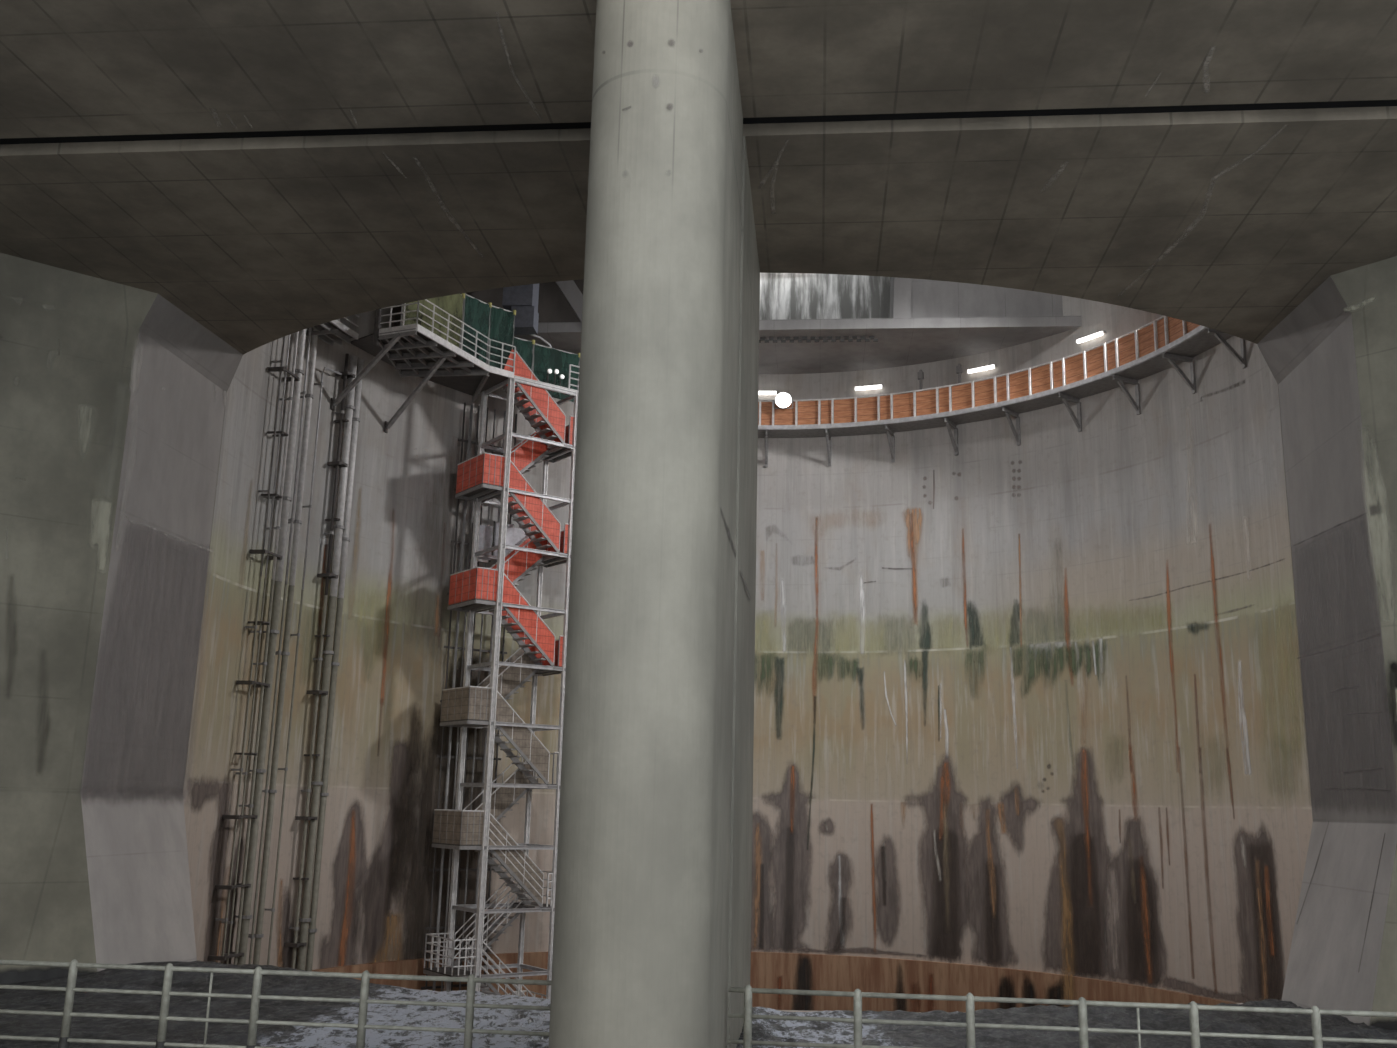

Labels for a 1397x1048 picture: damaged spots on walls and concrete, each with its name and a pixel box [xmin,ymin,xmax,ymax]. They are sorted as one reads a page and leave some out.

damp [447,656,489,689]
corrosion [809,543,818,826]
corrosion [906,509,922,613]
corrosion [1167,566,1180,758]
corrosion [1210,534,1224,706]
damp [319,711,490,969]
damp [751,686,1284,1012]
corrosion [1160,810,1194,978]